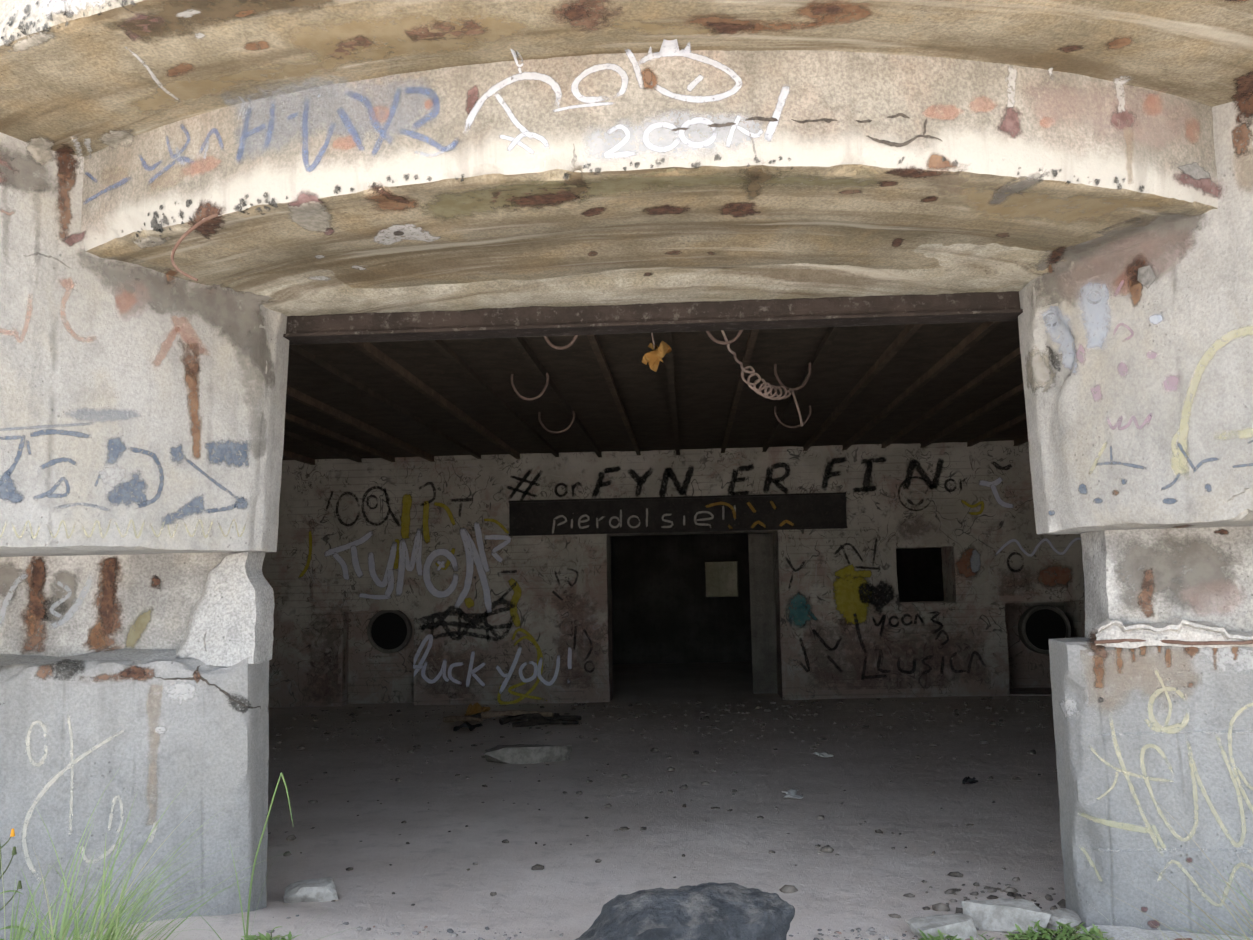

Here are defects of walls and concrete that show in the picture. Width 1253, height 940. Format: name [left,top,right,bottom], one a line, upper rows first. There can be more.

rust [167,63,194,77]
rust [244,41,269,51]
rust [405,20,486,41]
rust [553,0,872,35]
rust [1231,72,1253,155]
rust [55,144,86,247]
rust [179,341,201,459]
rust [21,556,122,680]
rust [1137,568,1155,618]
crack [151,633,261,713]
rust [1087,632,1238,702]